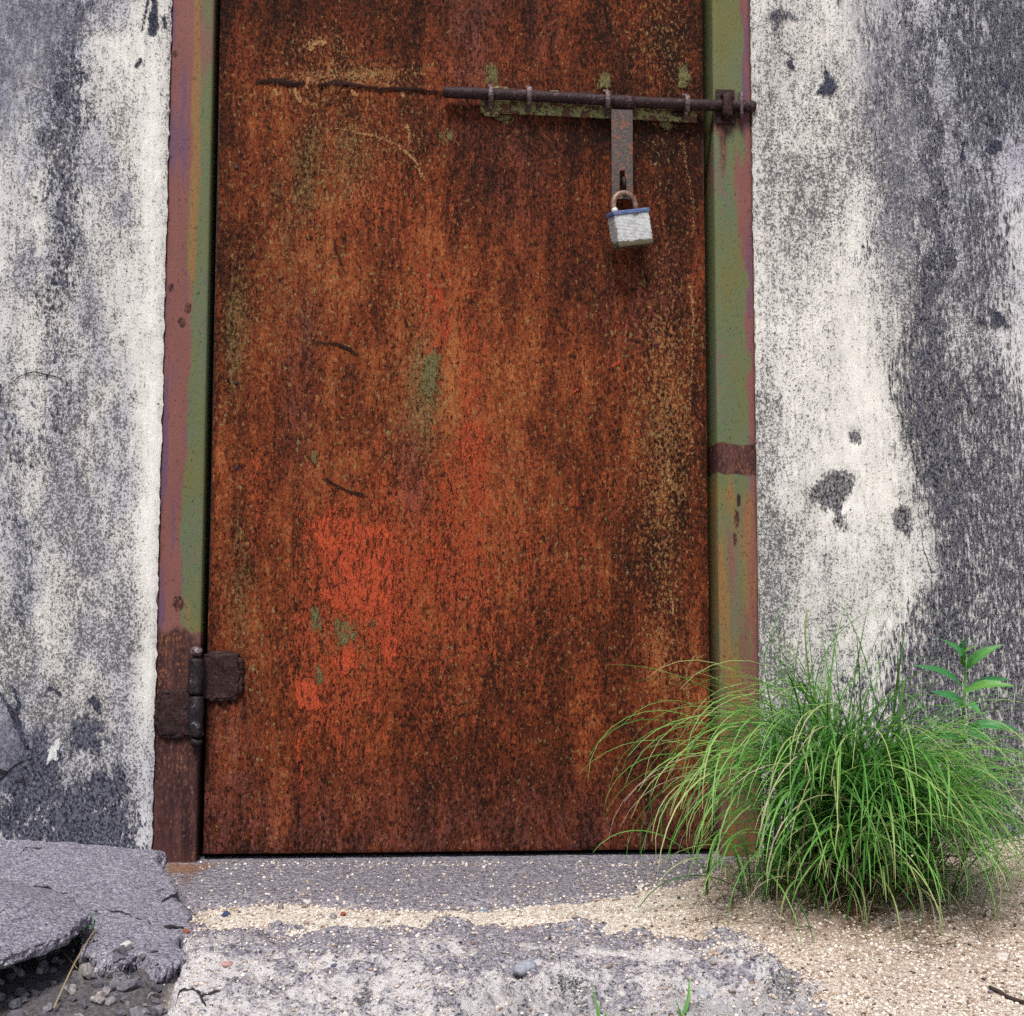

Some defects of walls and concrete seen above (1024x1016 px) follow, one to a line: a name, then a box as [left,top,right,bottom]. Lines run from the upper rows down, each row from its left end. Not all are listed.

damp [0,0,98,712]
damp [851,0,917,291]